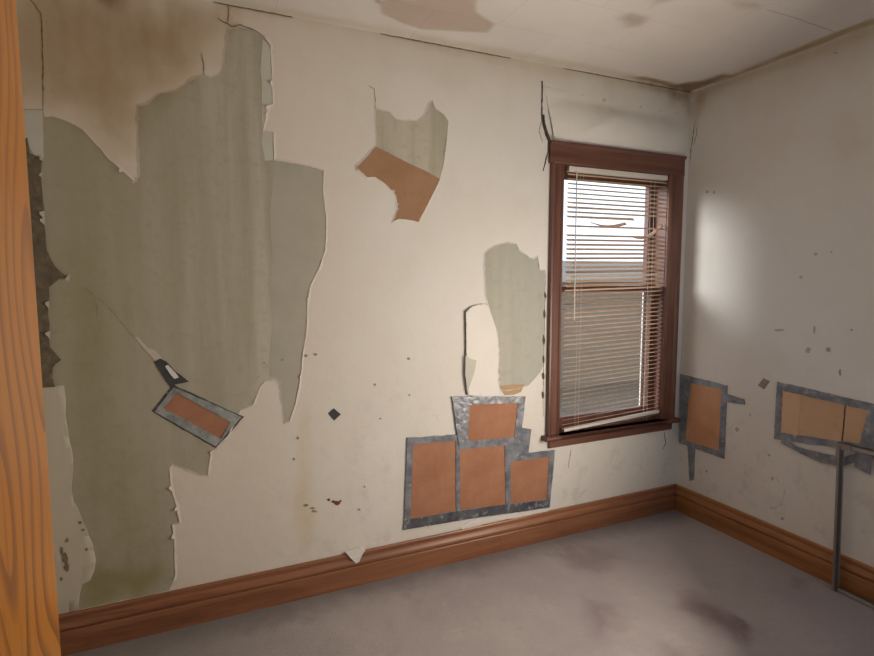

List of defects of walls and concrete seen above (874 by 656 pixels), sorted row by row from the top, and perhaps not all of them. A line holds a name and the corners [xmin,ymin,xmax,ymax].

flaking render [371,102,448,179]
crack [539,81,551,171]
flaking render [23,27,326,610]
flaking render [485,243,545,387]